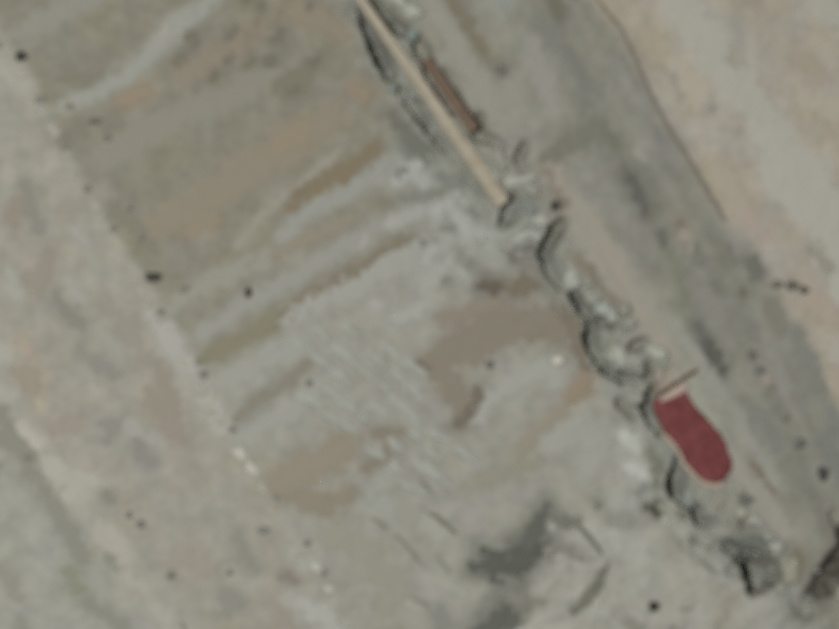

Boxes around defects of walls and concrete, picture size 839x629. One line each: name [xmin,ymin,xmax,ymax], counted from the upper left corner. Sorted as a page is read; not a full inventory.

crack [597,0,727,222]
crack [419,479,457,535]
crack [570,521,610,615]